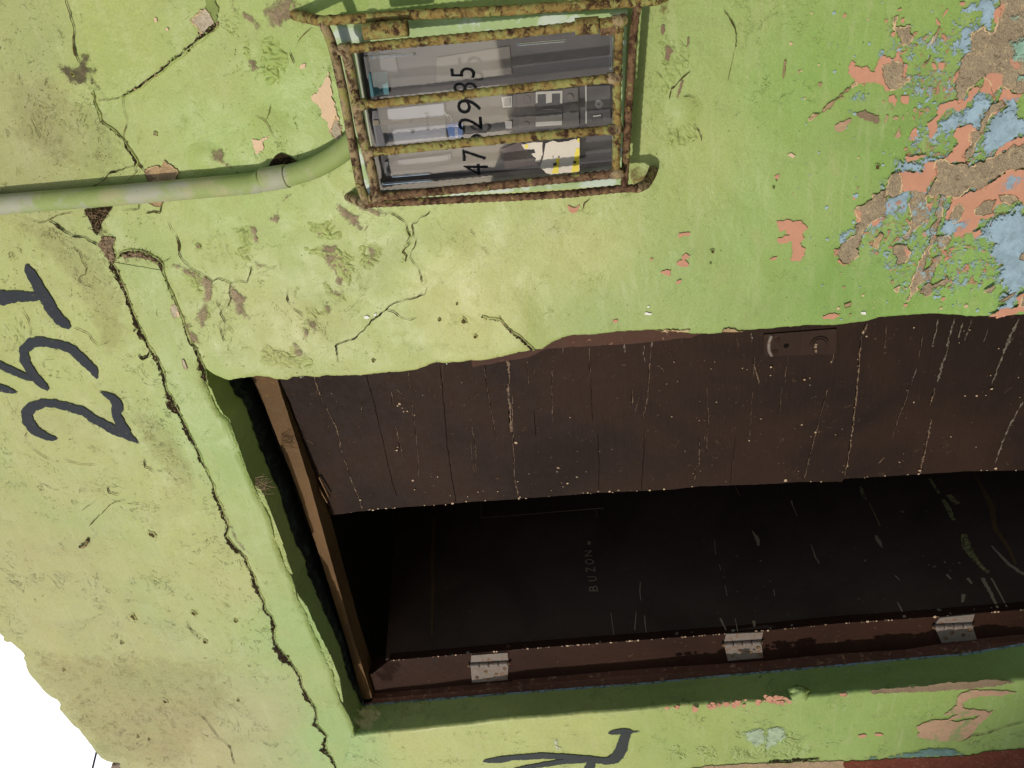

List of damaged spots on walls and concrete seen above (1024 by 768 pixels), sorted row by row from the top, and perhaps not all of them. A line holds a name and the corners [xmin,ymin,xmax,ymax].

crack [65,0,78,61]
spalling [190,0,219,36]
crack [91,22,218,186]
spalling [311,72,343,141]
peeling [808,0,1024,319]
peeling [776,219,808,262]
crack [335,213,429,362]
crack [481,315,536,351]
crack [26,202,337,768]
spalling [701,680,1024,768]